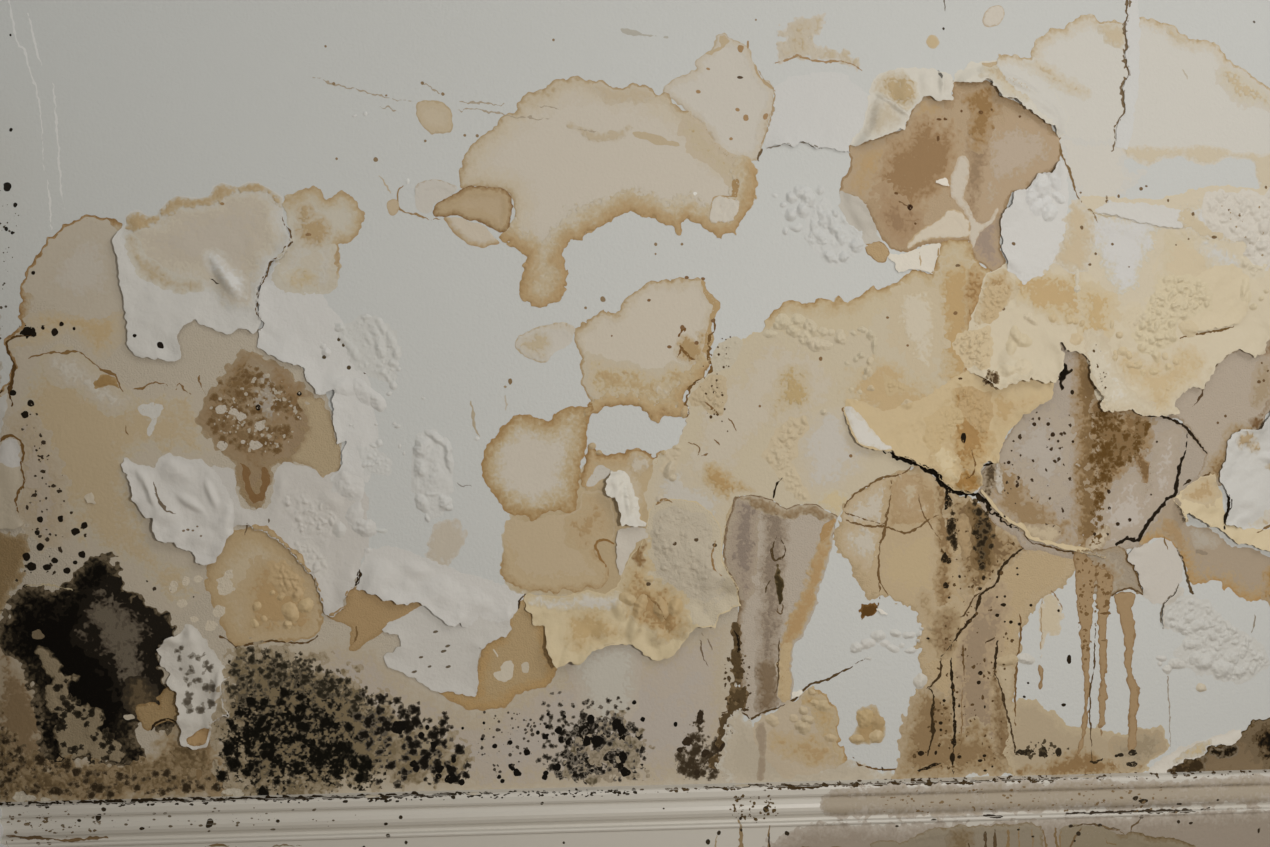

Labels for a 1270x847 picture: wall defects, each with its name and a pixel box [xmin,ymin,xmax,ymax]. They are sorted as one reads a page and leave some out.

water stain [0,305,655,822]
peeling [0,214,1075,802]
water stain [379,33,776,308]
water stain [481,239,990,596]
crack [722,604,863,720]
crack [844,451,1074,774]
water stain [674,487,1270,847]
peeling [765,72,1270,595]
crack [1111,0,1132,152]
water stain [997,14,1270,275]
crack [1089,364,1233,764]
crack [1180,326,1234,339]